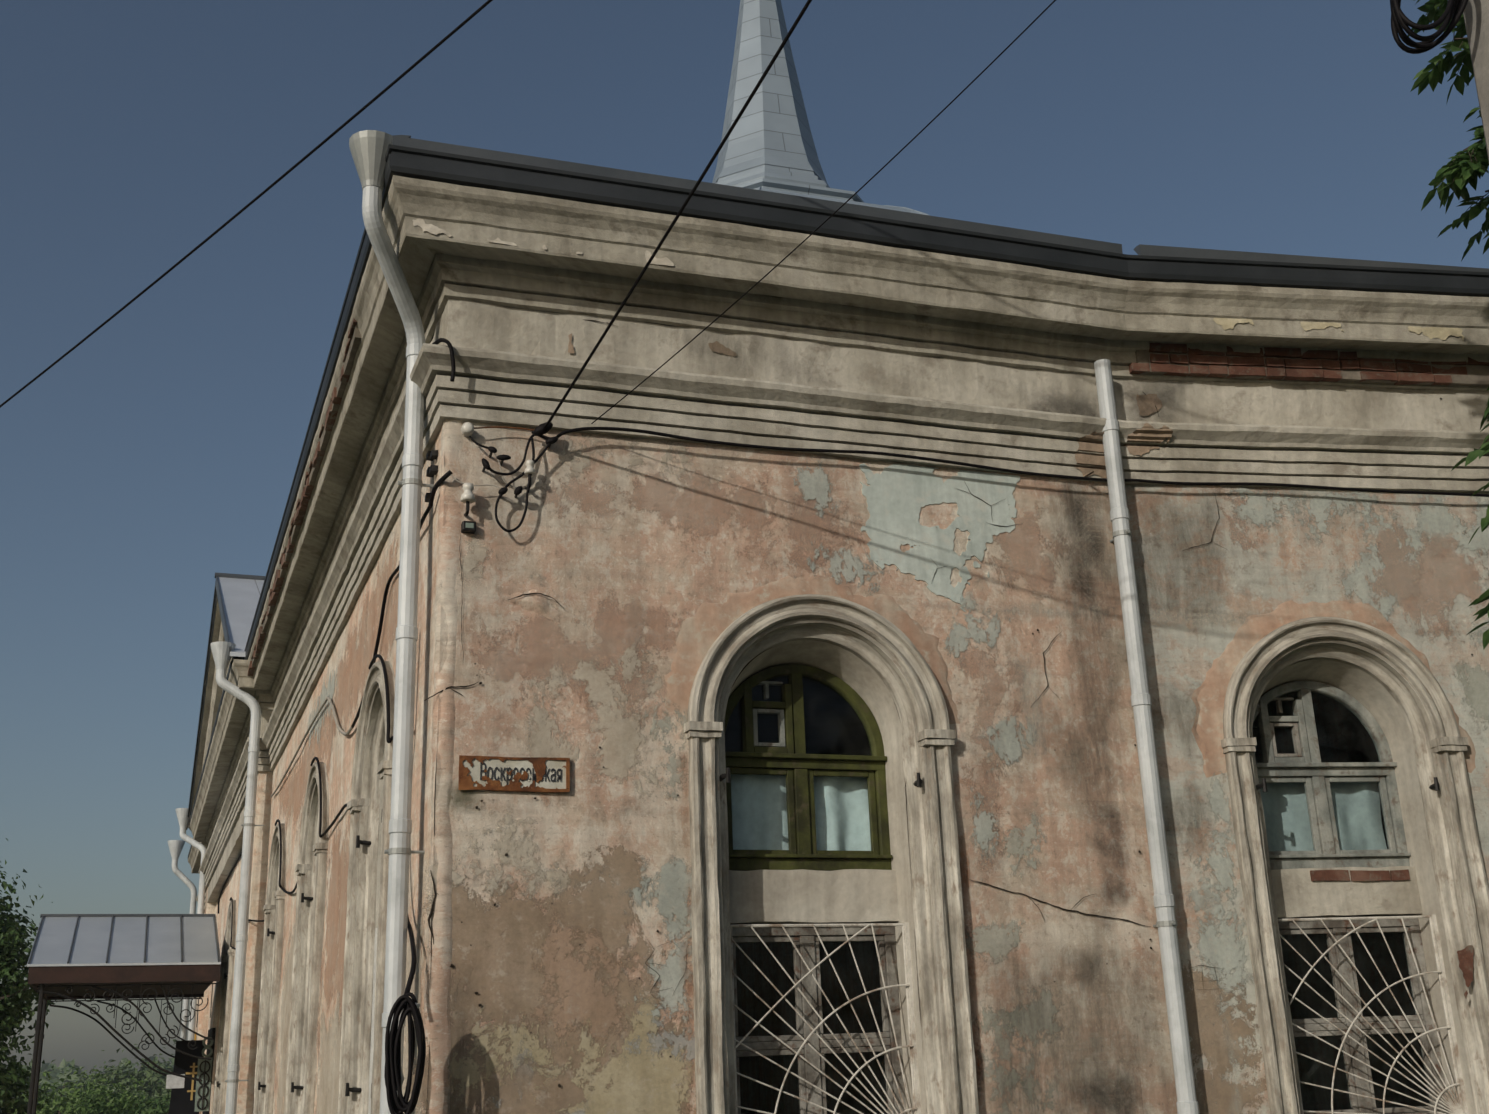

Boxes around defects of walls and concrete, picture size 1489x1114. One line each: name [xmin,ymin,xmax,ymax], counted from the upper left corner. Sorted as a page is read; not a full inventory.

flaking render [1129,318,1489,399]
peeling [791,460,841,518]
flaking render [1074,432,1107,478]
flaking render [1124,394,1173,456]
peeling [805,463,1020,667]
peeling [1230,488,1489,620]
peeling [1455,618,1489,730]
crack [969,879,1151,927]